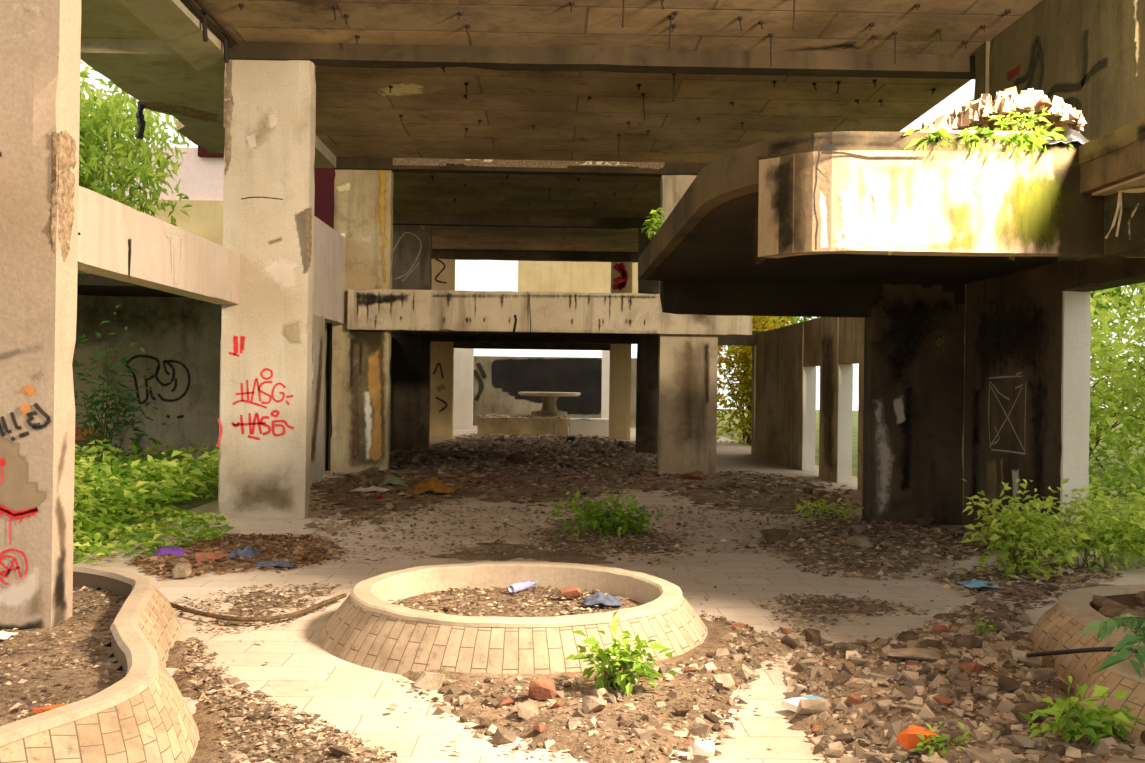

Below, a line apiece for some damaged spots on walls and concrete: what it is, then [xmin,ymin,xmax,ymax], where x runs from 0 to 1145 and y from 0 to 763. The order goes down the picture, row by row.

spalling [49,130,77,263]
leakage [760,134,901,258]
leakage [936,191,983,249]
leakage [527,294,655,329]